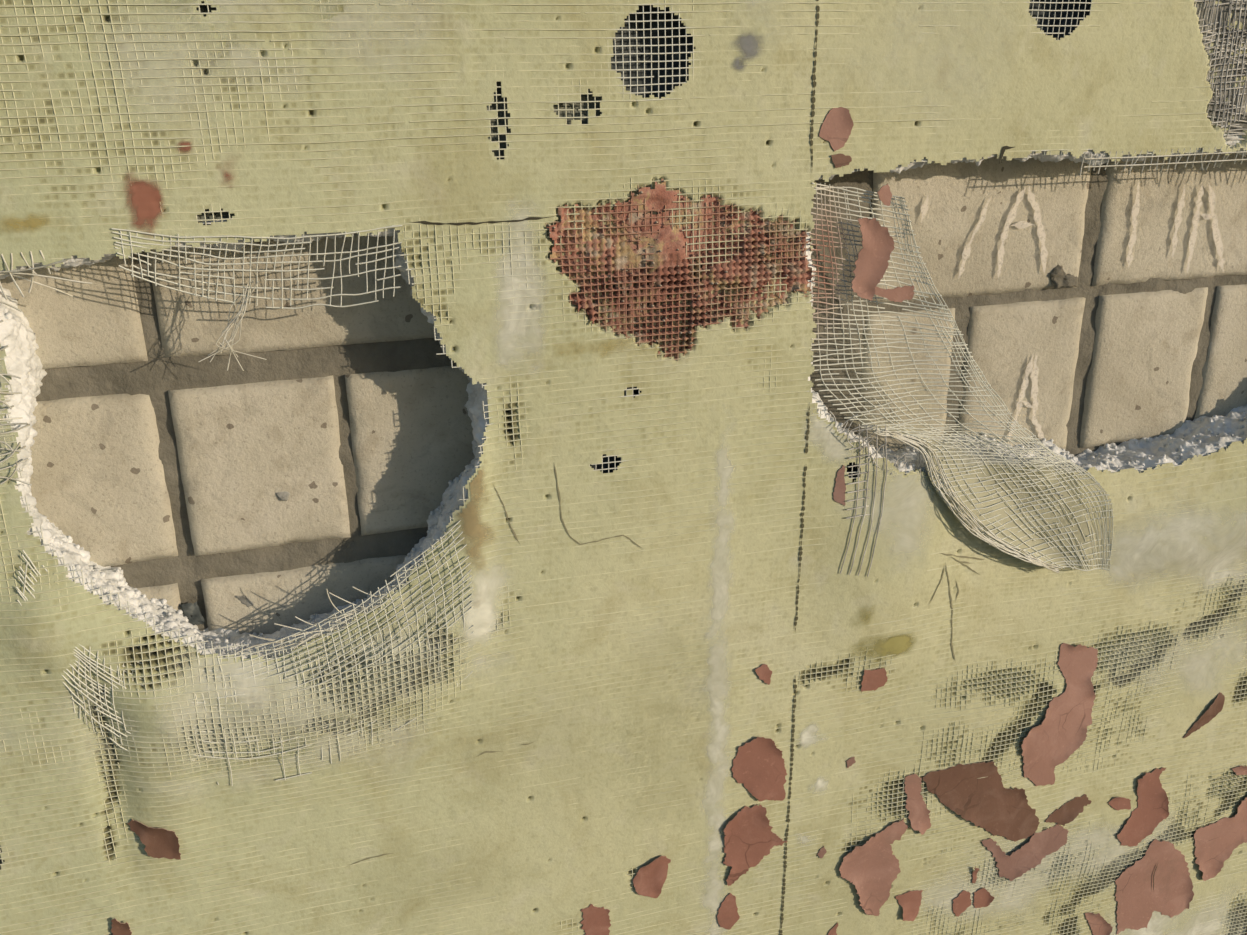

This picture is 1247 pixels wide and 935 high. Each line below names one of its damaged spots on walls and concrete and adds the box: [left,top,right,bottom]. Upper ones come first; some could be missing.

spalling [611,5,696,99]
spalling [1029,0,1091,40]
peeling [819,107,868,180]
spalling [0,228,489,659]
spalling [941,404,1247,473]
peeling [1021,643,1098,786]
peeling [1183,692,1225,738]
peeling [717,737,788,930]
peeling [839,774,931,921]
peeling [952,867,994,917]
peeling [982,794,1092,881]
peeling [1084,767,1247,935]